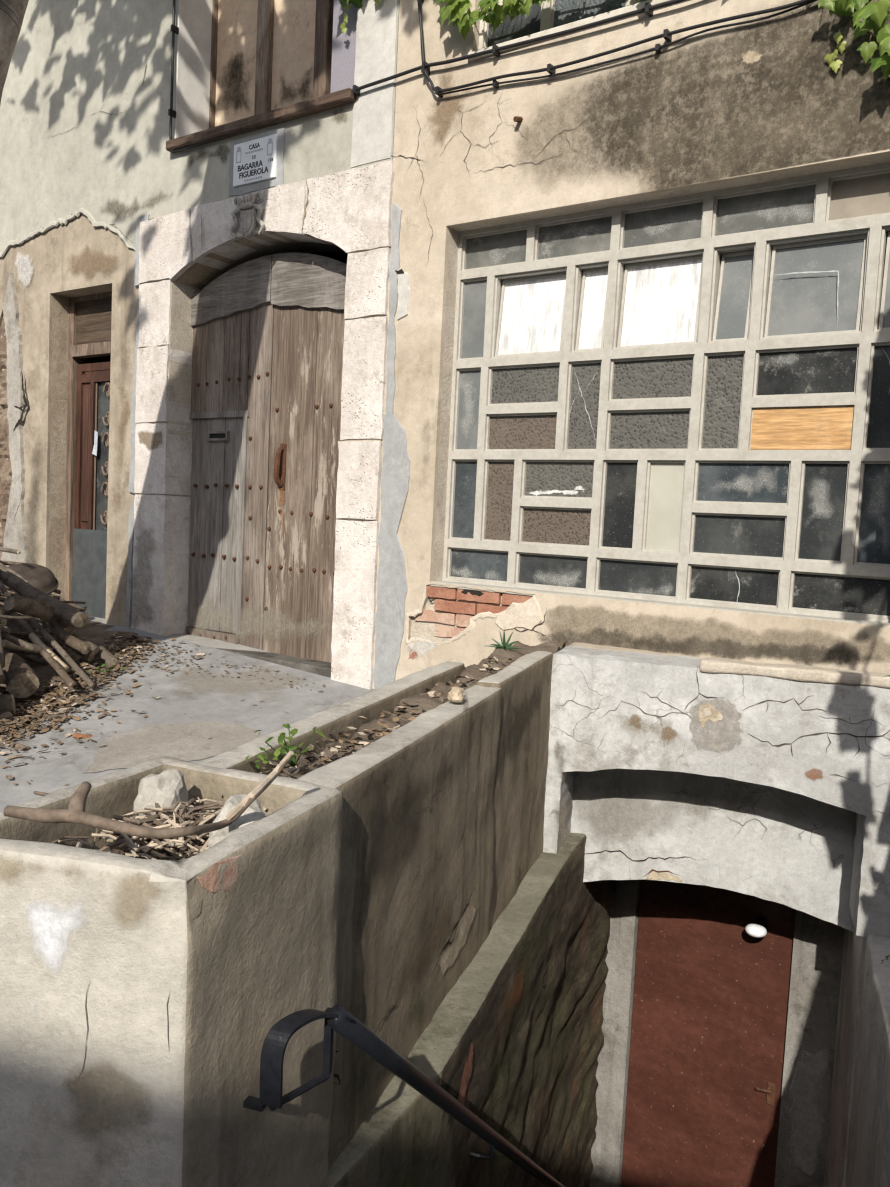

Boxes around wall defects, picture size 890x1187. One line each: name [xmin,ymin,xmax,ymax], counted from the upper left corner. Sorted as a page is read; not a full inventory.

water stain [221,55,246,109]
water stain [282,71,310,100]
water stain [433,76,459,140]
water stain [526,0,890,191]
crack [393,89,587,263]
peeling [0,208,135,258]
flaking render [405,585,542,645]
water stain [542,607,890,665]
spalling [689,699,742,752]
crack [564,667,890,815]
crack [726,799,767,839]